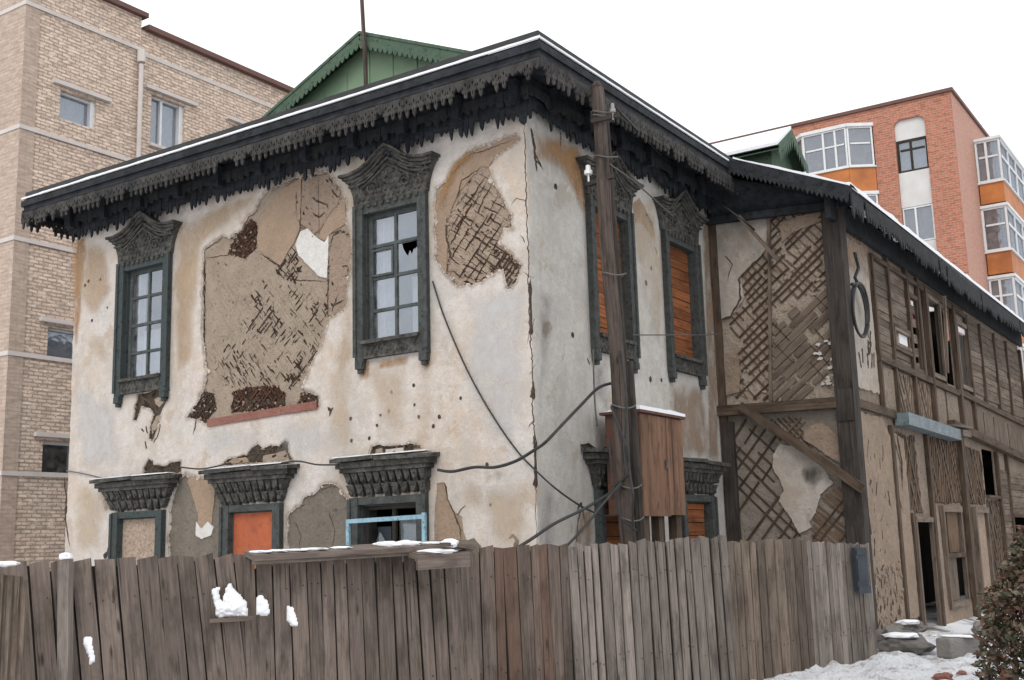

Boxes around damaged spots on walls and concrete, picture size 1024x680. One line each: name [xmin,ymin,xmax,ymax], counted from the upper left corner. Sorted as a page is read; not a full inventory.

spalling [133,389,222,563]
spalling [223,441,294,465]
spalling [188,170,352,427]
spalling [287,483,347,548]
peeling [435,482,466,540]
spalling [434,135,533,335]
crack [509,125,561,547]
spalling [813,340,835,396]